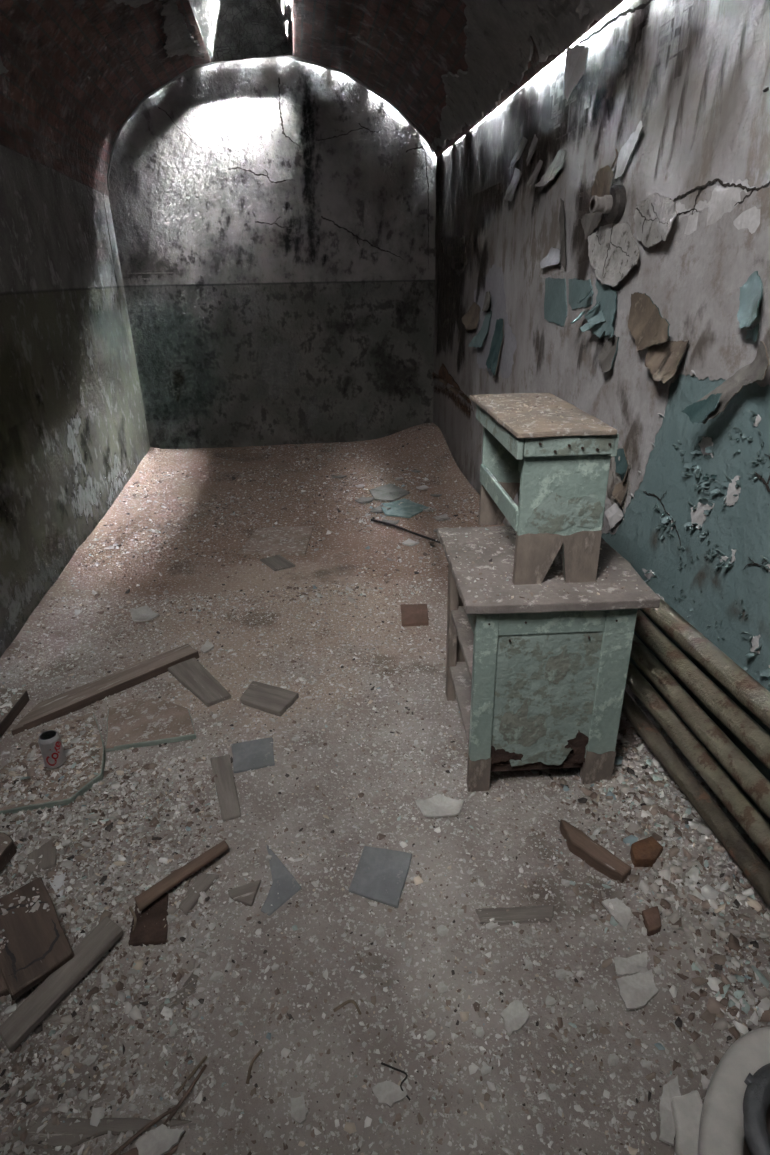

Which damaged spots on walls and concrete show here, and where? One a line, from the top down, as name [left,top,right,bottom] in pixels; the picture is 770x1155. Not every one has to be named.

spalling [114,0,205,59]
crack [557,0,653,56]
crack [278,77,387,147]
spalling [431,0,626,150]
crack [228,167,295,183]
damp [282,66,328,264]
crack [321,146,429,264]
flaking render [504,134,566,201]
peeling [591,121,643,197]
crack [670,178,770,216]
peeling [462,179,770,570]
peeling [735,599,770,687]